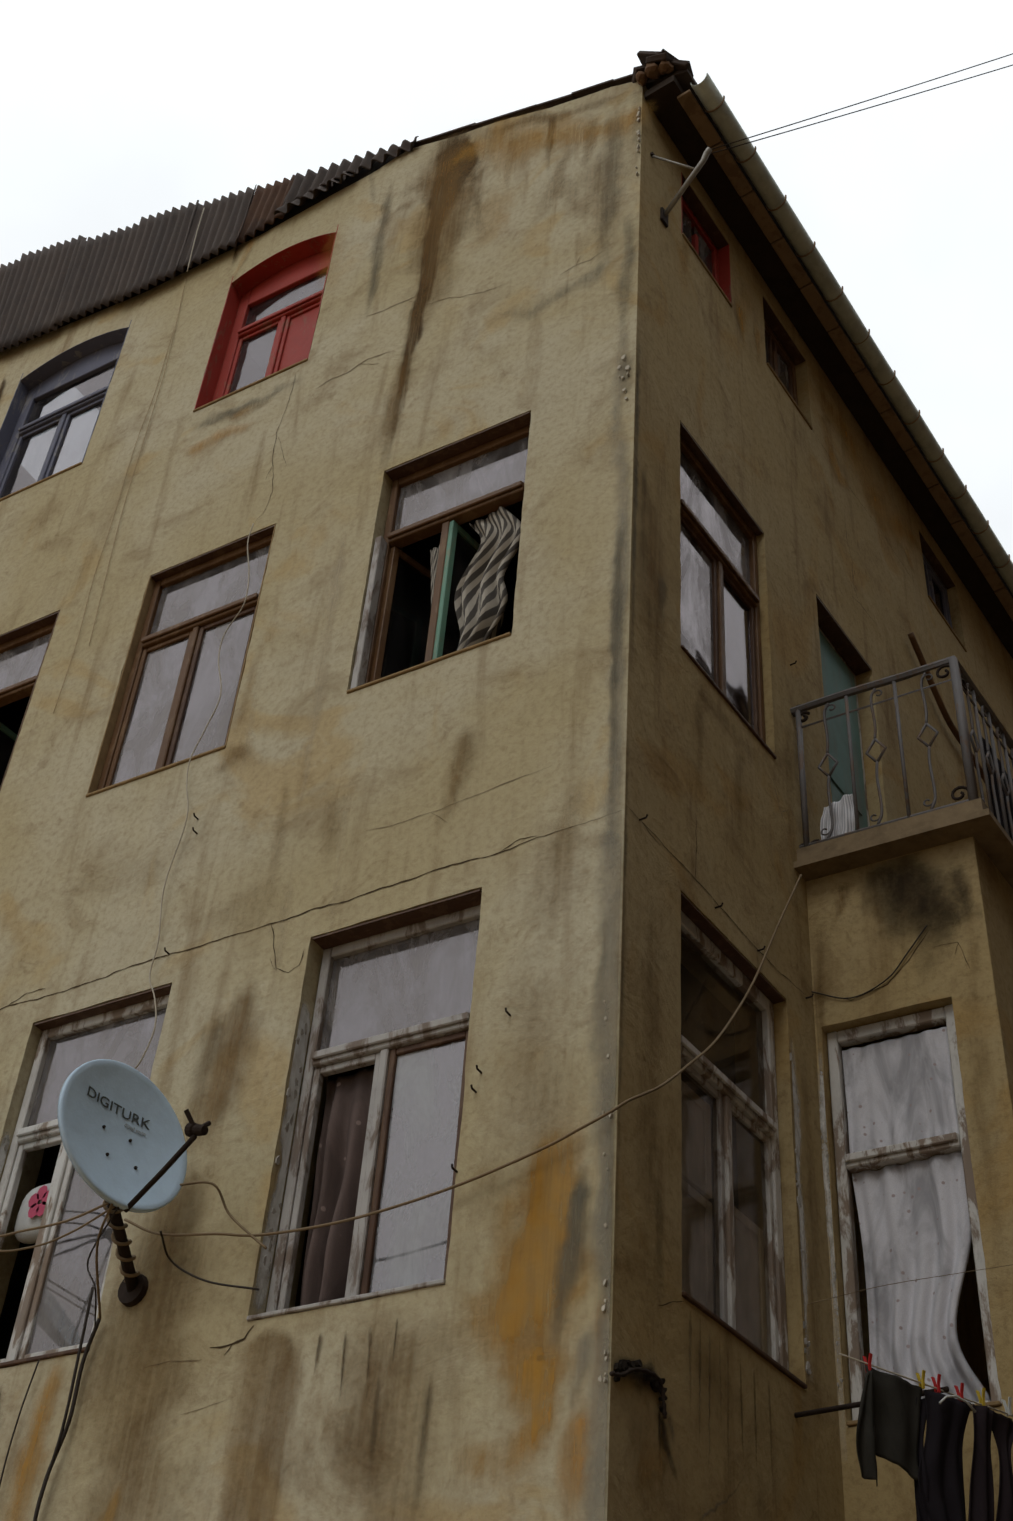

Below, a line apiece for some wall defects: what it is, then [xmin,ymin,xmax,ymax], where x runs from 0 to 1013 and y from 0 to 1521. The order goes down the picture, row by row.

leakage [387,138,477,410]
corrosion [481,1136,575,1450]